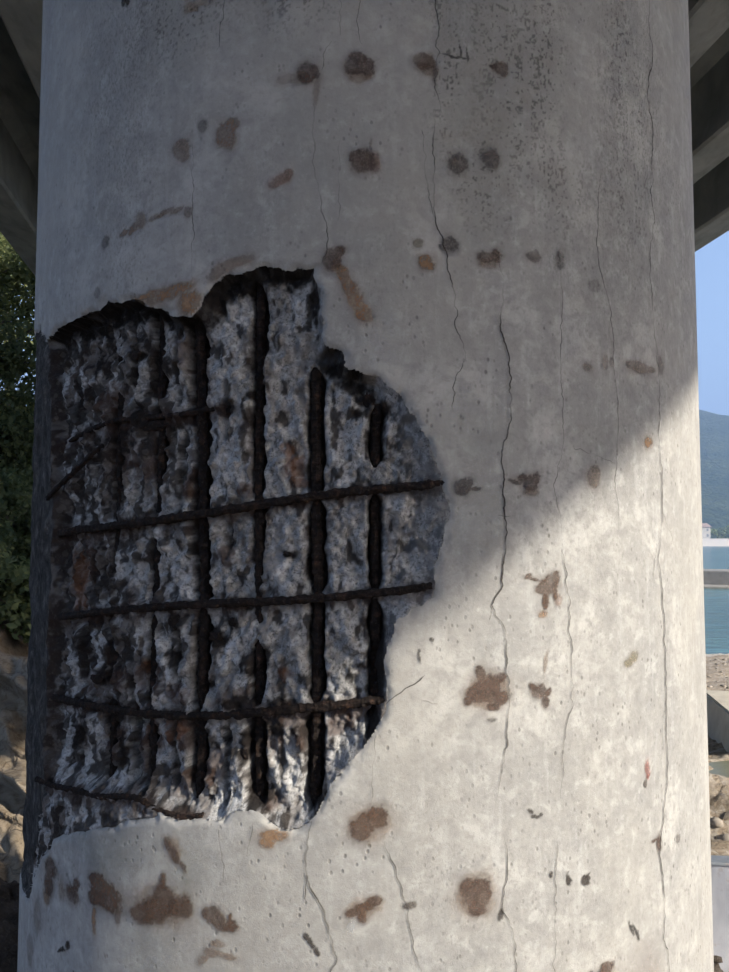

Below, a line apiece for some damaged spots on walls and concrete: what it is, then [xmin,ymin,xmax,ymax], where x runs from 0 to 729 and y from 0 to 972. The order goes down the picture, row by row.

crack [428,191,453,285]
corrosion [323,246,371,321]
crack [500,316,512,391]
spalling [21,266,451,899]
crack [491,416,512,695]
corrosion [525,571,560,617]
corrosion [464,666,509,711]
crack [654,538,673,961]
corrosion [350,806,388,841]
corrosion [66,873,239,962]
crack [304,860,329,930]
corrosion [460,878,492,916]